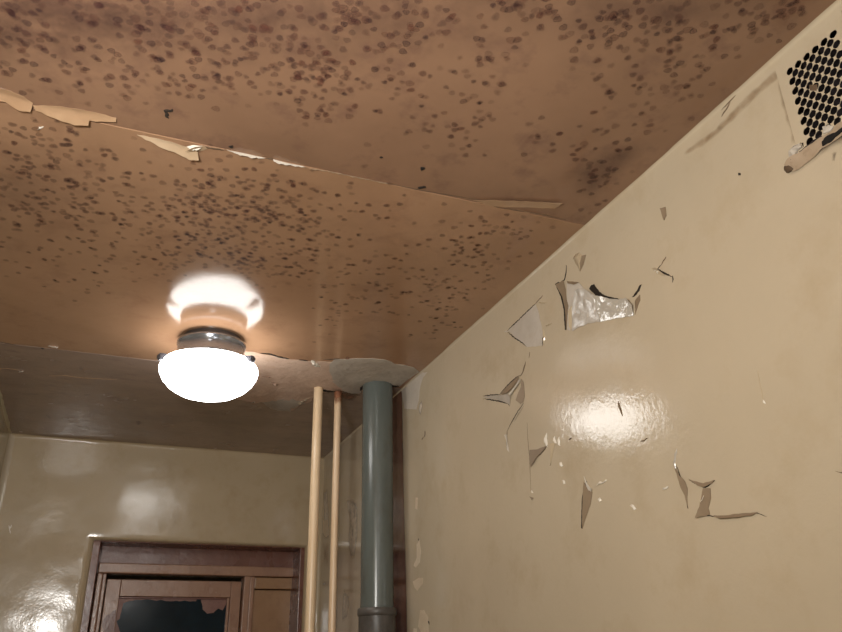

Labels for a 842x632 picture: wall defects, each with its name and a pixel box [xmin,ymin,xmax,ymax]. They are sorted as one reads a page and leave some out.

peeling [0,88,116,126]
peeling [138,135,566,220]
flaking render [784,122,842,173]
peeling [555,265,642,331]
flaking render [234,351,427,413]
peeling [485,298,552,405]
peeling [529,433,563,467]
peeling [581,477,607,528]
peeling [673,449,767,519]